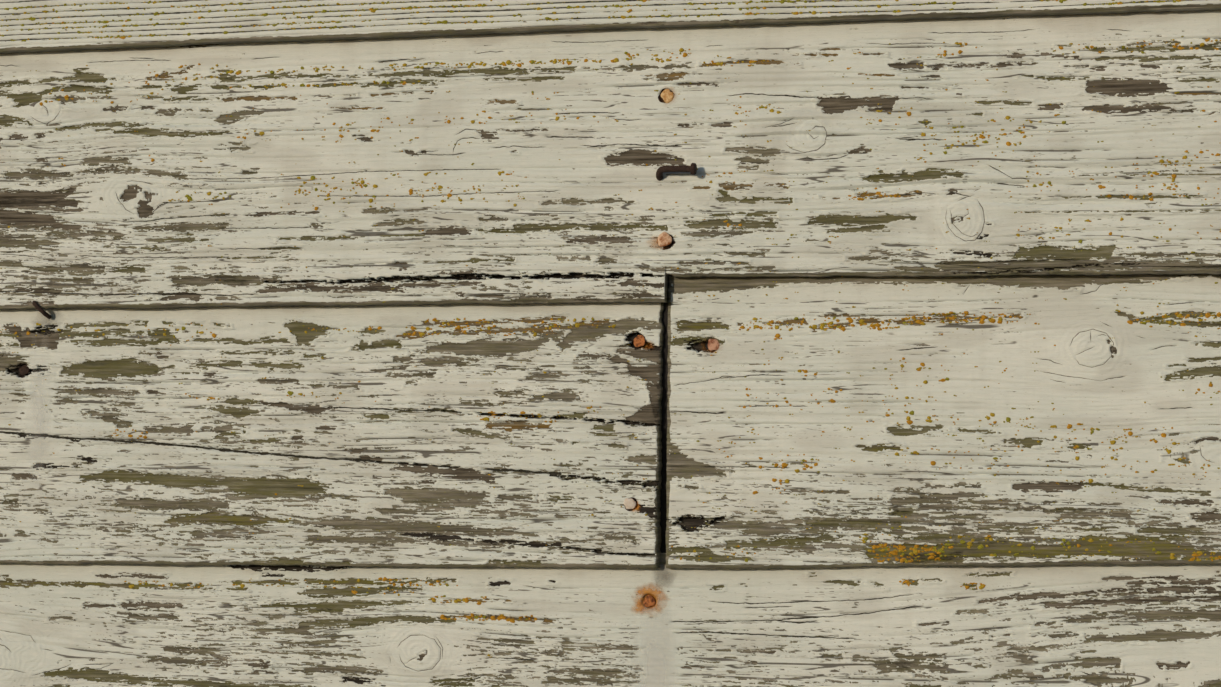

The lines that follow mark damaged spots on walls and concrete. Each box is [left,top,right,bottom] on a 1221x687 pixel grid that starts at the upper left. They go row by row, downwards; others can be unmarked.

peeling [0,48,840,152]
peeling [816,40,1221,116]
peeling [0,157,230,307]
peeling [684,146,793,238]
peeling [361,198,1221,299]
peeling [0,320,359,443]
peeling [149,258,743,489]
crack [0,412,382,463]
crack [485,468,567,477]
peeling [0,449,640,687]
rust [636,587,661,611]
peeling [667,481,1221,680]